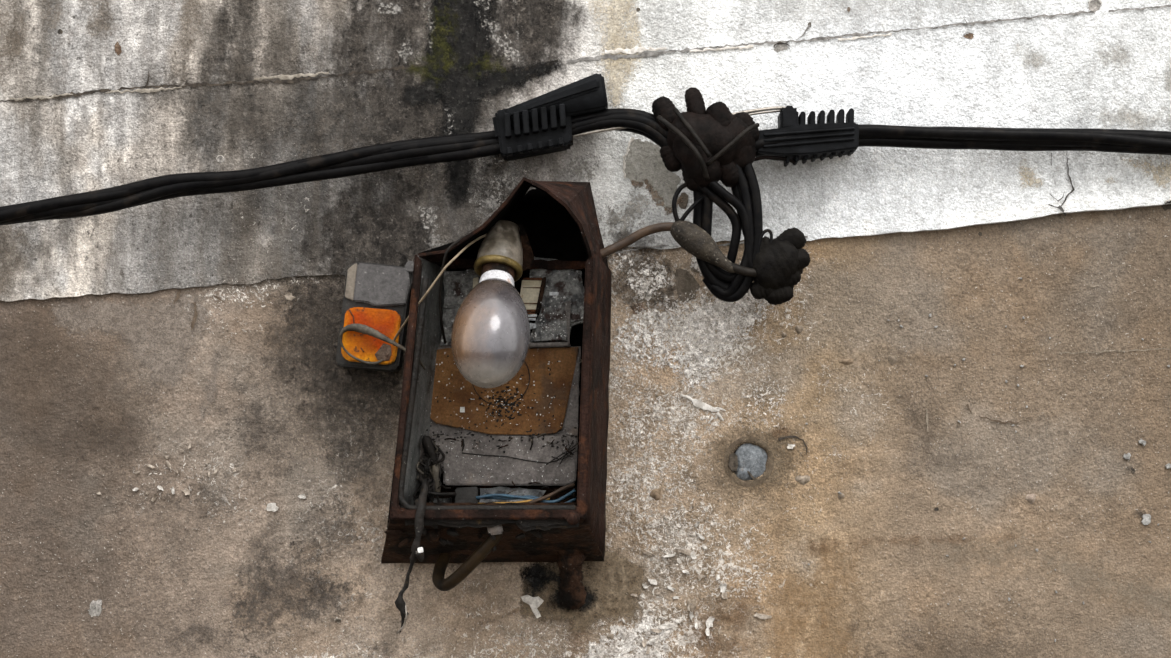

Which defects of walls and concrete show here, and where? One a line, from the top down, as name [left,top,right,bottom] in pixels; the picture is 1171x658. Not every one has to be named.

water stain [84,0,111,35]
crack [523,5,1171,79]
crack [0,64,447,102]
water stain [161,0,642,172]
crack [1048,153,1075,216]